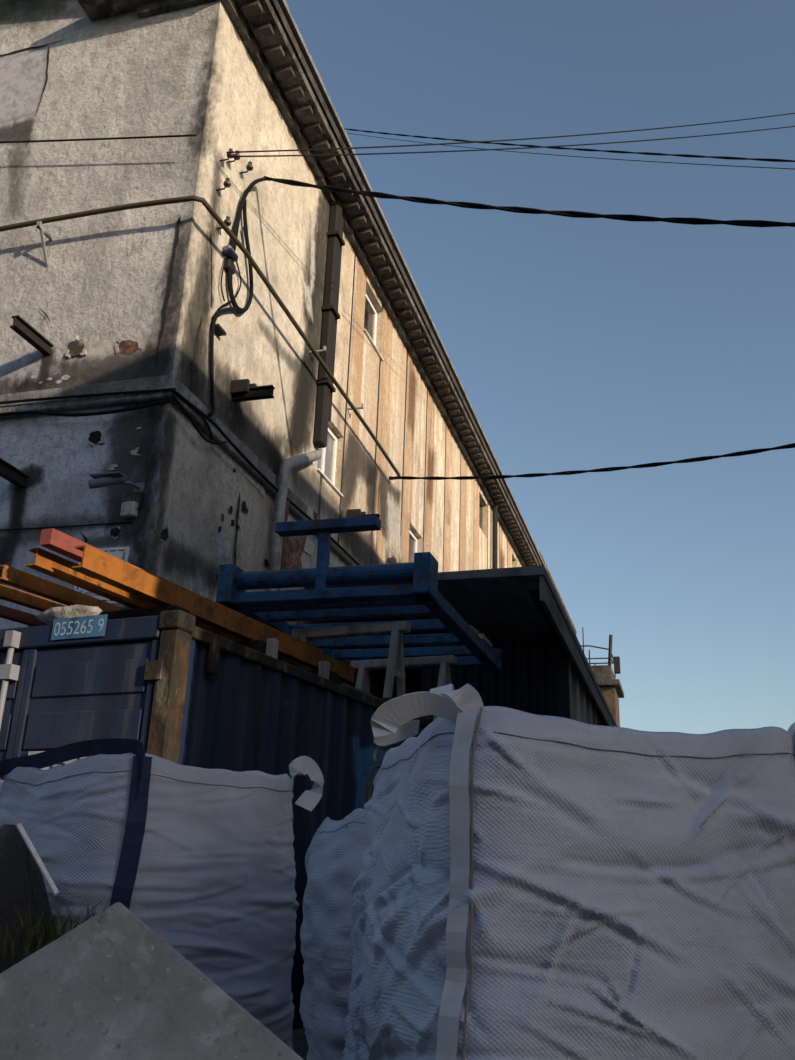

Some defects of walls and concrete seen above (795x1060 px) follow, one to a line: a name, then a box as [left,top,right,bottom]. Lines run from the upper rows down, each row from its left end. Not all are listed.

leakage [0,119,33,211]
peeling [65,336,161,365]
leakage [0,163,314,475]
leakage [305,232,316,319]
leakage [295,430,401,565]